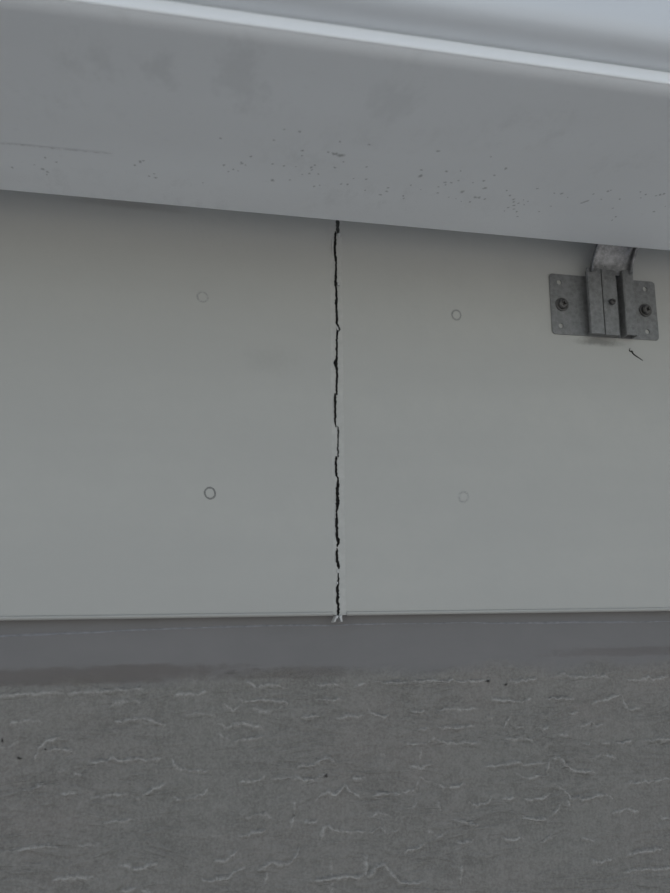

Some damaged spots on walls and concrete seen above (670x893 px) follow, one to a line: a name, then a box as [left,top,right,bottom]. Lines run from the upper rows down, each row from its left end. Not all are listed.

crack [331,220,343,623]